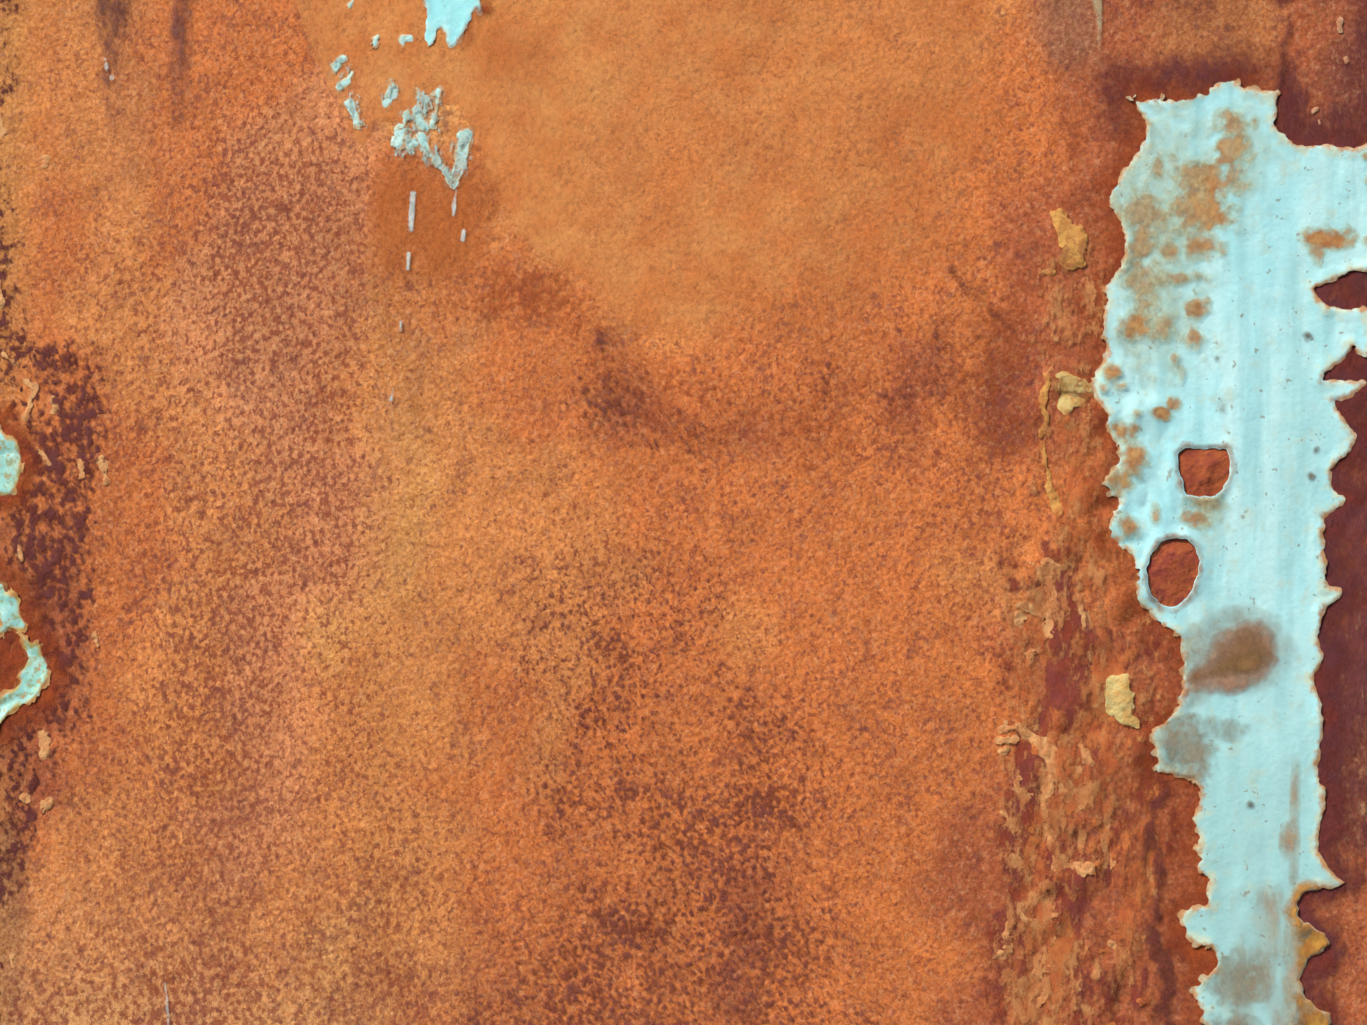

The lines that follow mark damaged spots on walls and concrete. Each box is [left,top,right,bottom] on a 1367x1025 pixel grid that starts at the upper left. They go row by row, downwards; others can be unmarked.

peeling [330,54,365,130]
peeling [381,78,475,190]
peeling [398,0,489,48]
corrosion [1303,228,1367,262]
peeling [0,407,38,509]
corrosion [0,168,111,905]
corrosion [984,109,1263,1025]
peeling [1080,69,1367,1025]
peeling [0,563,66,741]
corrosion [1185,614,1275,694]
corrosion [455,550,896,1025]
corrosion [1266,882,1329,1025]